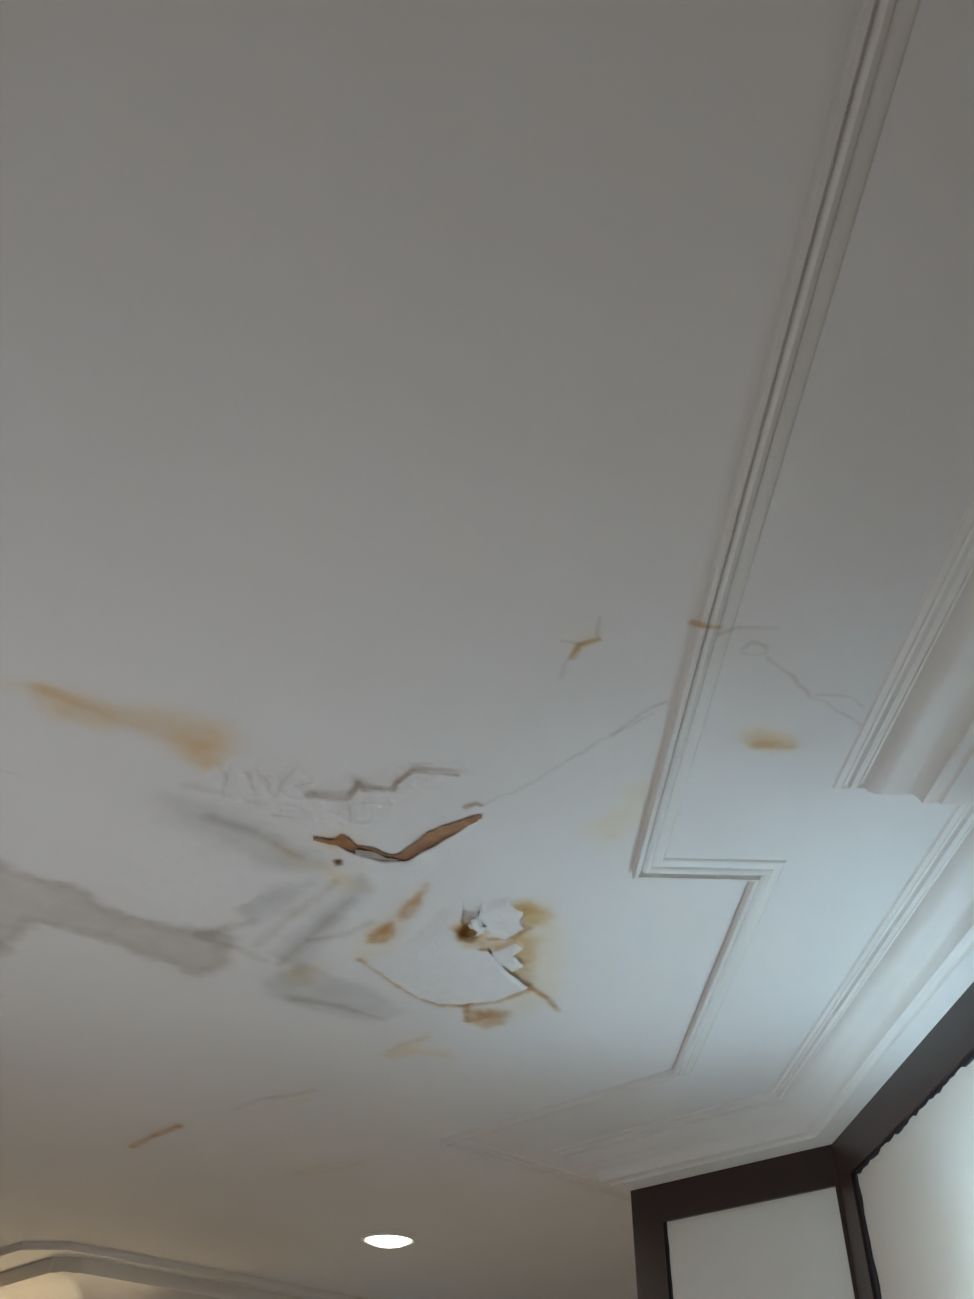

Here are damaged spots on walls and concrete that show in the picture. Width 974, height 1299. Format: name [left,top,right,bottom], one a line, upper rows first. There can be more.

flaking render [361,895,528,1005]